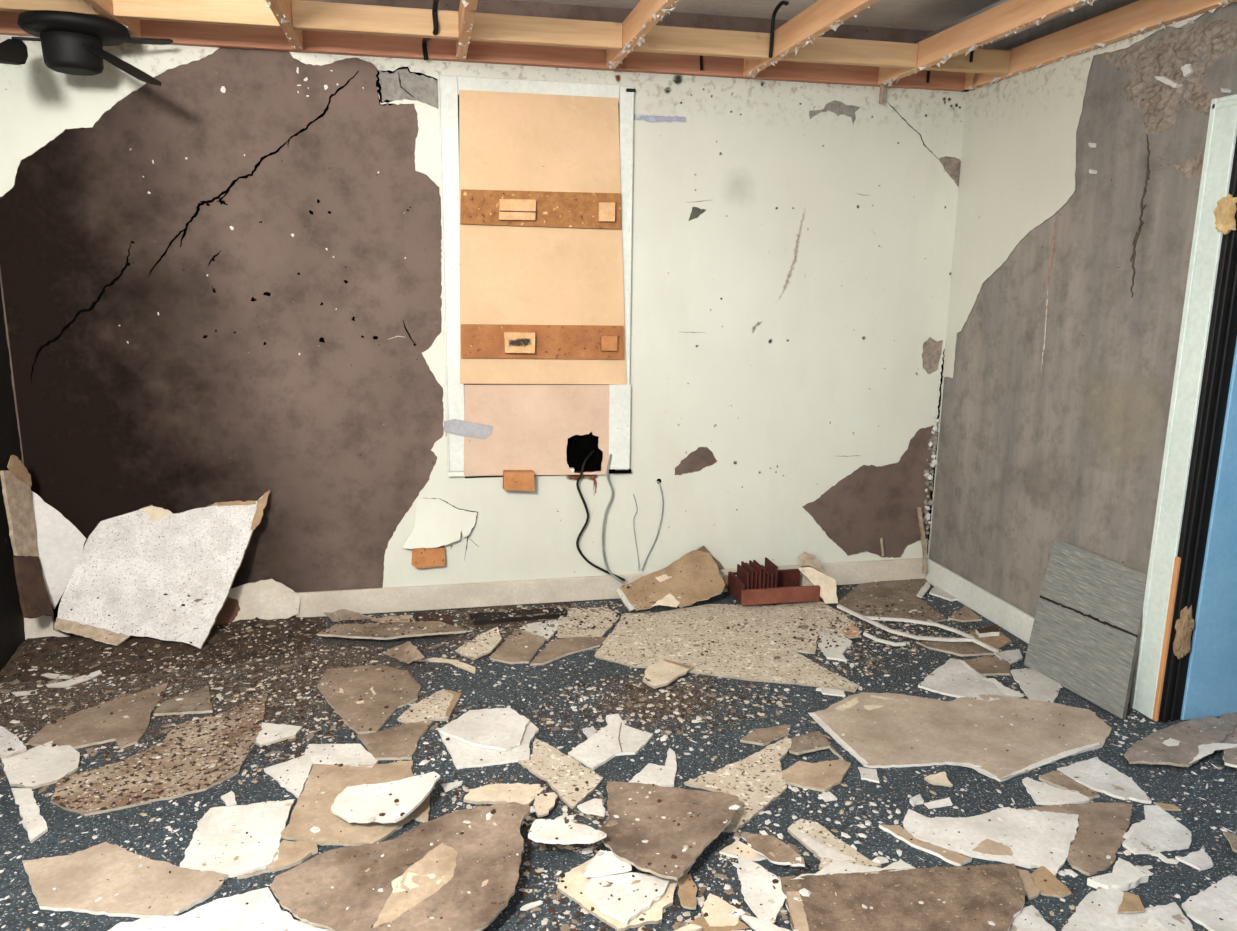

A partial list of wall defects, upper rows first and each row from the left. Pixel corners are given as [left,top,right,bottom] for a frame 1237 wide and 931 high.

spalling [0,285,25,671]
crack [30,71,359,384]
spalling [80,47,444,593]
spalling [675,447,717,475]
spalling [802,2,1237,618]
crack [1130,134,1150,298]